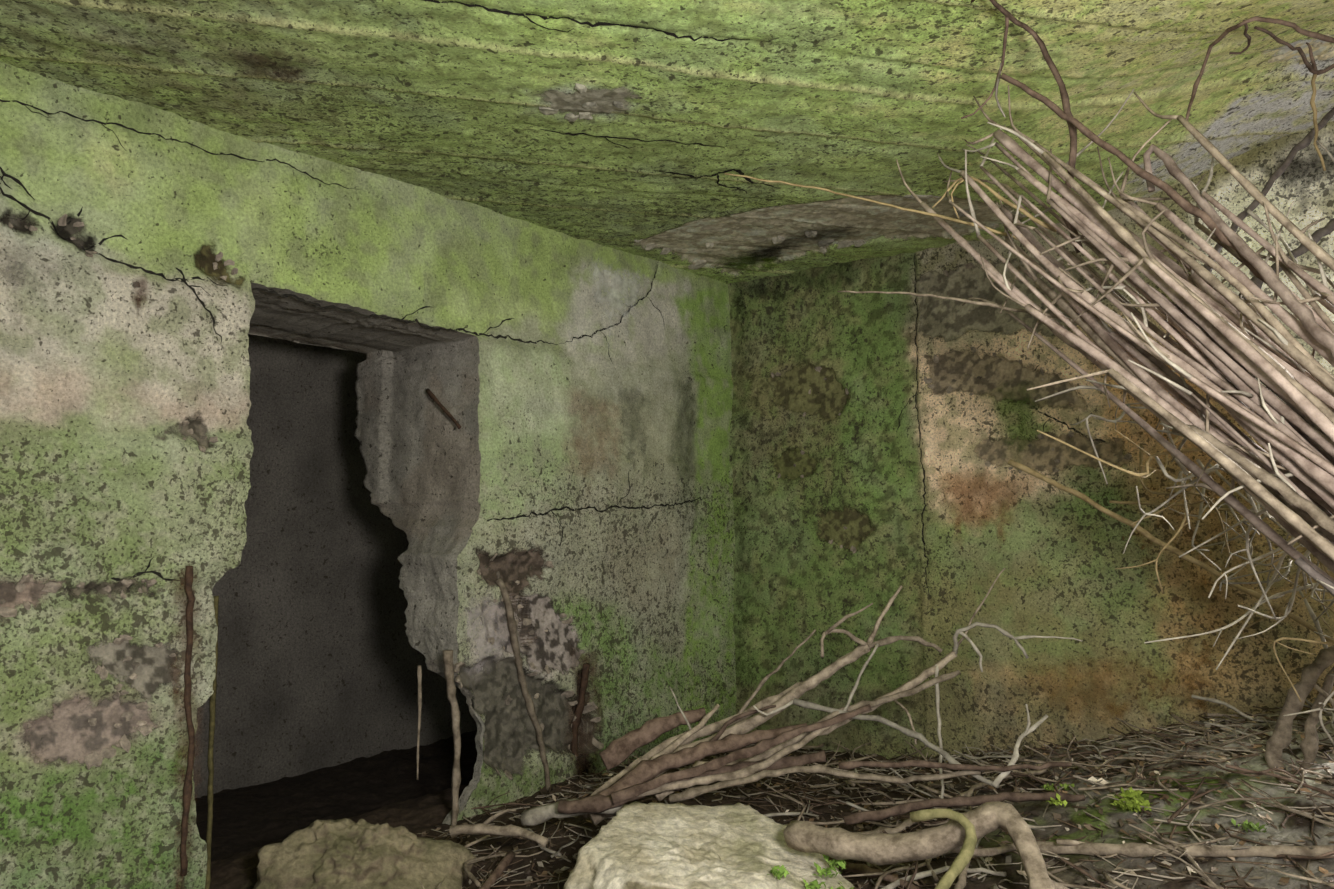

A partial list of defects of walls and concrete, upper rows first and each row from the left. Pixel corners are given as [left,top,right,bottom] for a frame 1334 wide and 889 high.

crack [423,0,749,42]
crack [0,99,354,189]
peeling [634,195,1027,275]
crack [487,472,710,546]
rust [178,565,219,889]
rust [569,653,603,775]